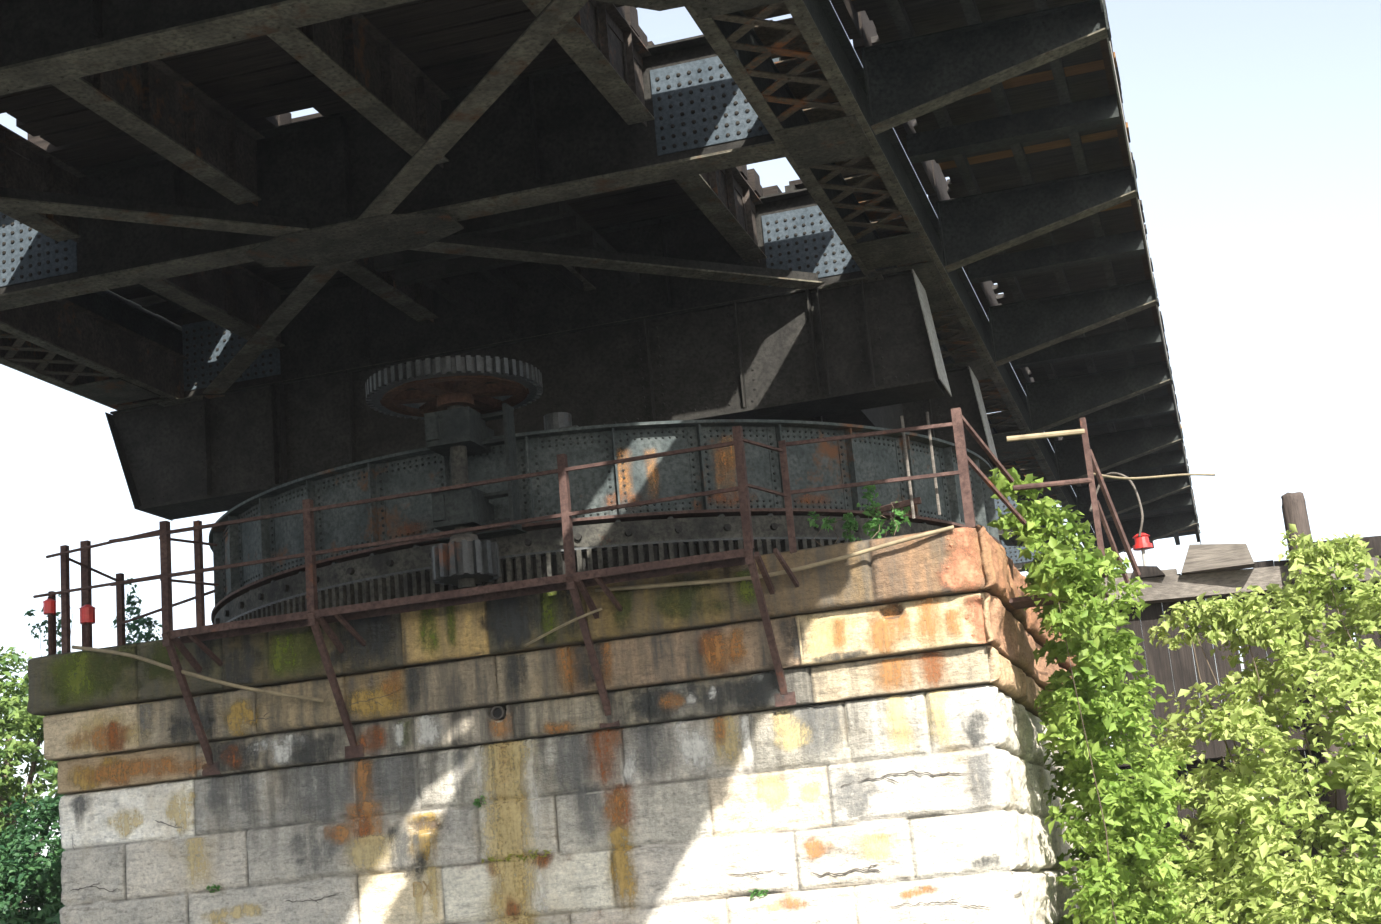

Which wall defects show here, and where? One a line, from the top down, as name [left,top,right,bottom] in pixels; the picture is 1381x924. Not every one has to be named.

corrosion [68,715,200,790]
corrosion [223,700,257,768]
corrosion [324,675,400,869]
corrosion [485,719,550,924]
corrosion [592,729,636,906]
crack [841,770,967,787]
corrosion [871,597,959,745]